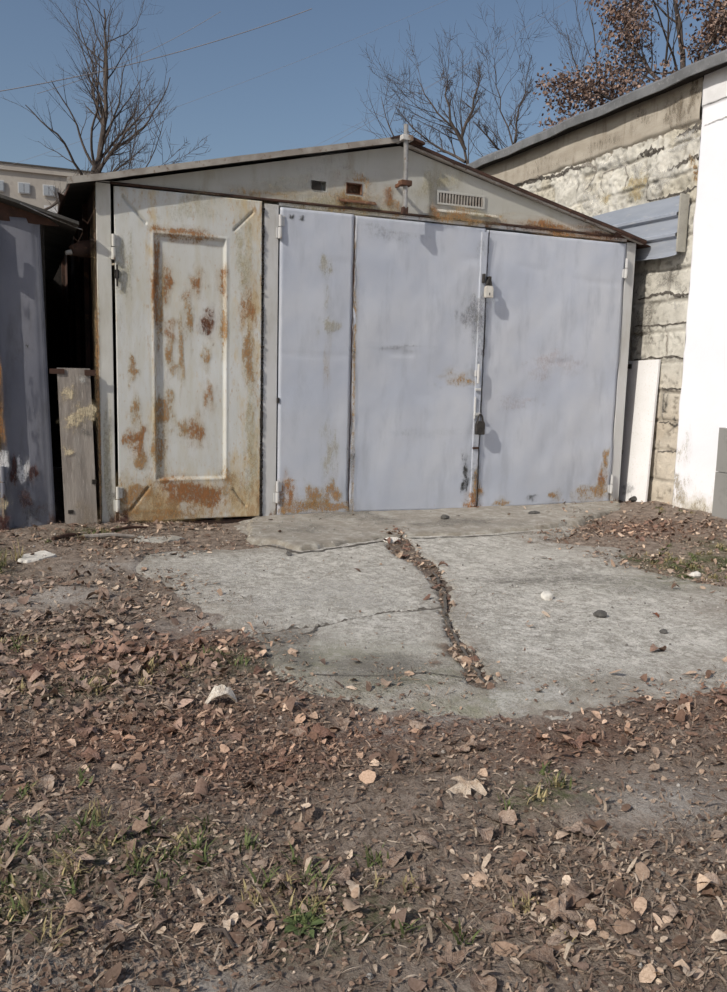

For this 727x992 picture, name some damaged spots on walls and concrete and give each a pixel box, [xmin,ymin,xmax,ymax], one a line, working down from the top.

peeling [0,450,39,516]
peeling [61,377,96,428]
corrosion [116,389,235,522]
corrosion [151,225,229,379]
corrosion [230,187,294,517]
corrosion [278,269,356,514]
corrosion [577,450,611,500]
crack [262,531,533,690]